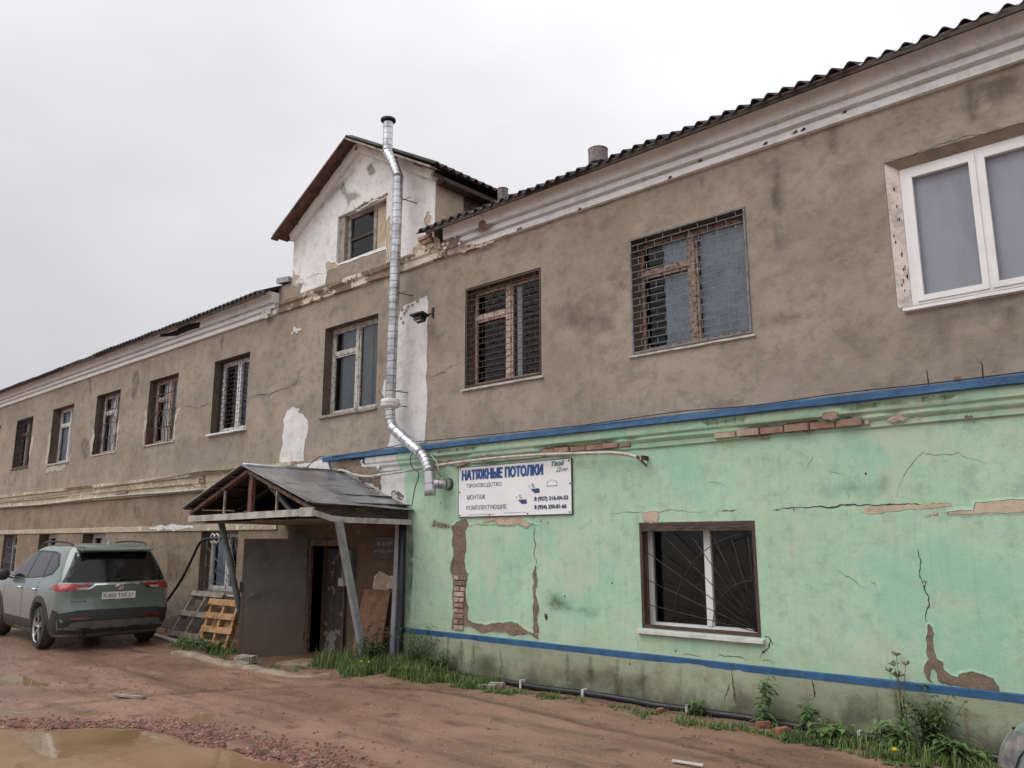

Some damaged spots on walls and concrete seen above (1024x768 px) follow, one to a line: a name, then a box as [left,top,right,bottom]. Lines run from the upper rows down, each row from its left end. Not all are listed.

flaking render [325,214,392,285]
flaking render [279,405,405,502]
spalling [538,441,631,453]
spalling [641,508,660,523]
spalling [714,411,871,439]
crack [776,452,1002,511]
spalling [372,570,393,590]
spalling [448,515,548,642]
crack [918,551,930,622]
spalling [921,621,1003,692]